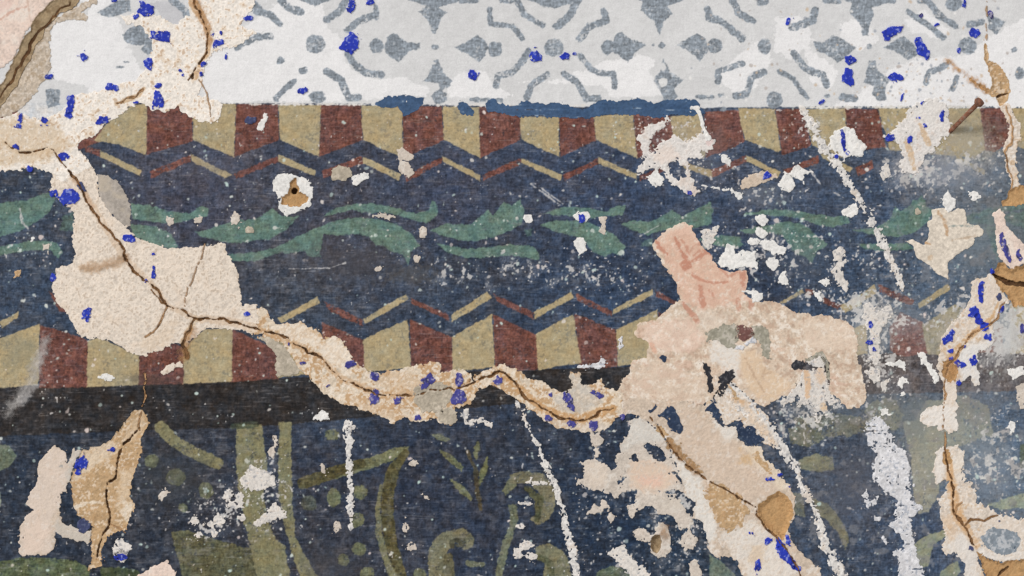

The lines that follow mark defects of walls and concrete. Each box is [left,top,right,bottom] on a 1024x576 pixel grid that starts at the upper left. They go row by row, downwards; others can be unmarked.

rust [946,59,988,93]
peeling [0,0,479,426]
crack [5,142,613,421]
water stain [799,105,905,292]
peeling [907,28,1024,576]
flaking render [18,410,150,571]
crack [97,373,147,557]
water stain [342,420,355,531]
water stain [515,401,580,576]
peeling [473,222,867,576]
water stain [861,416,925,576]
crack [942,302,1005,545]